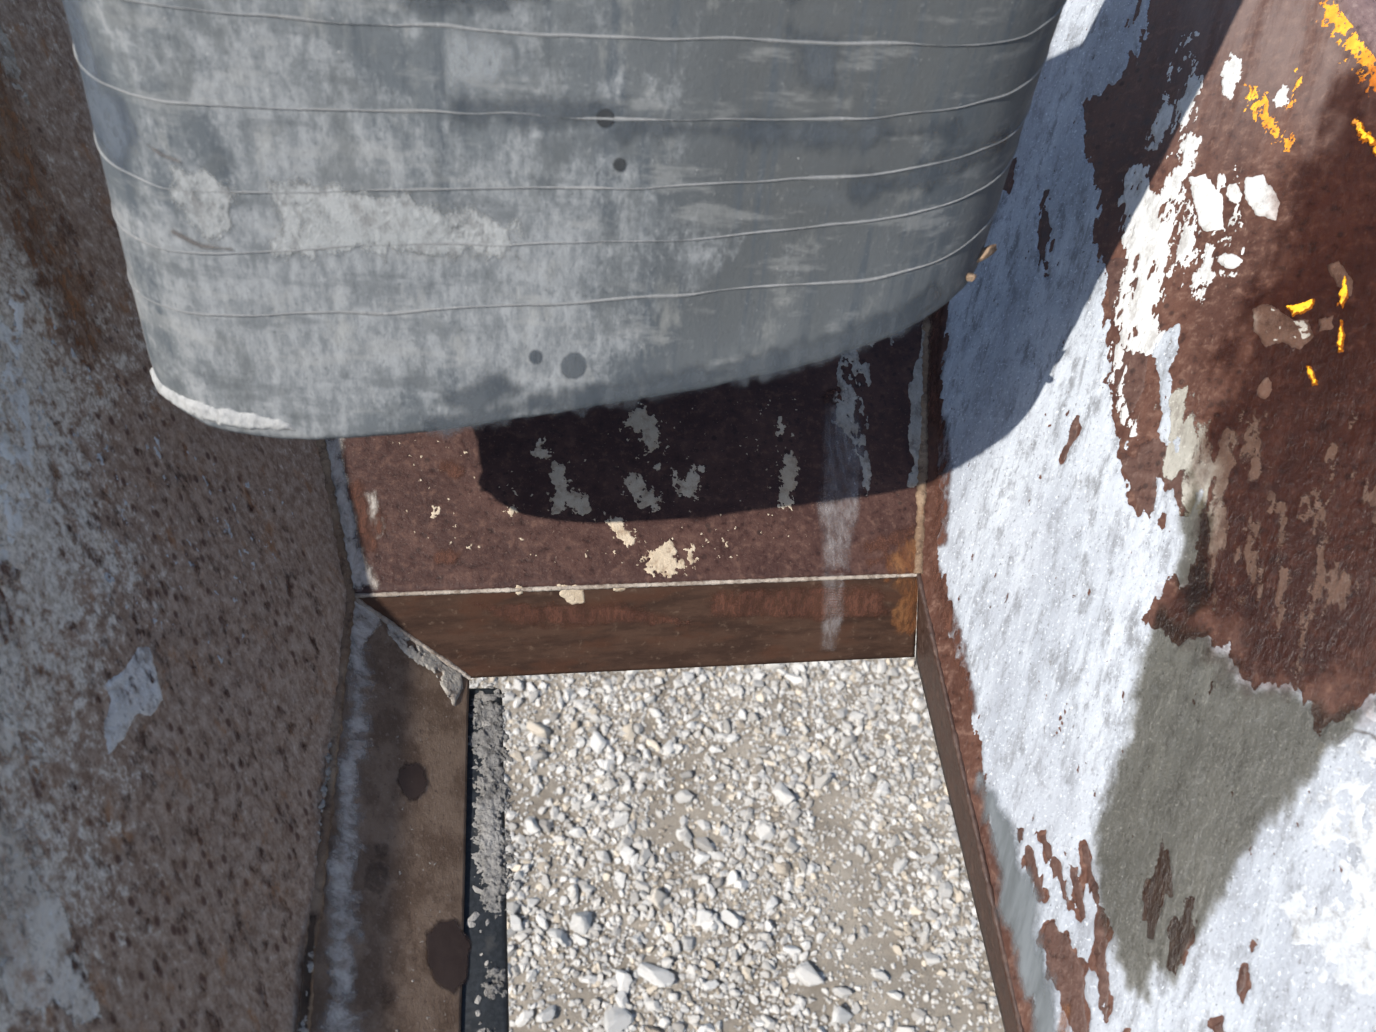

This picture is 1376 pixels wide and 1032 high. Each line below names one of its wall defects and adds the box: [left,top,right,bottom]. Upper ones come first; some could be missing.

peeling [1316,0,1376,98]
corrosion [1239,68,1302,152]
peeling [1104,31,1280,519]
peeling [1286,299,1313,314]
peeling [621,402,705,512]
spalling [1062,415,1080,460]
corrosion [349,480,385,551]
peeling [530,437,699,578]
peeling [104,646,163,754]
leakage [397,762,427,801]
leakage [426,919,471,994]
spalling [1017,828,1109,1032]